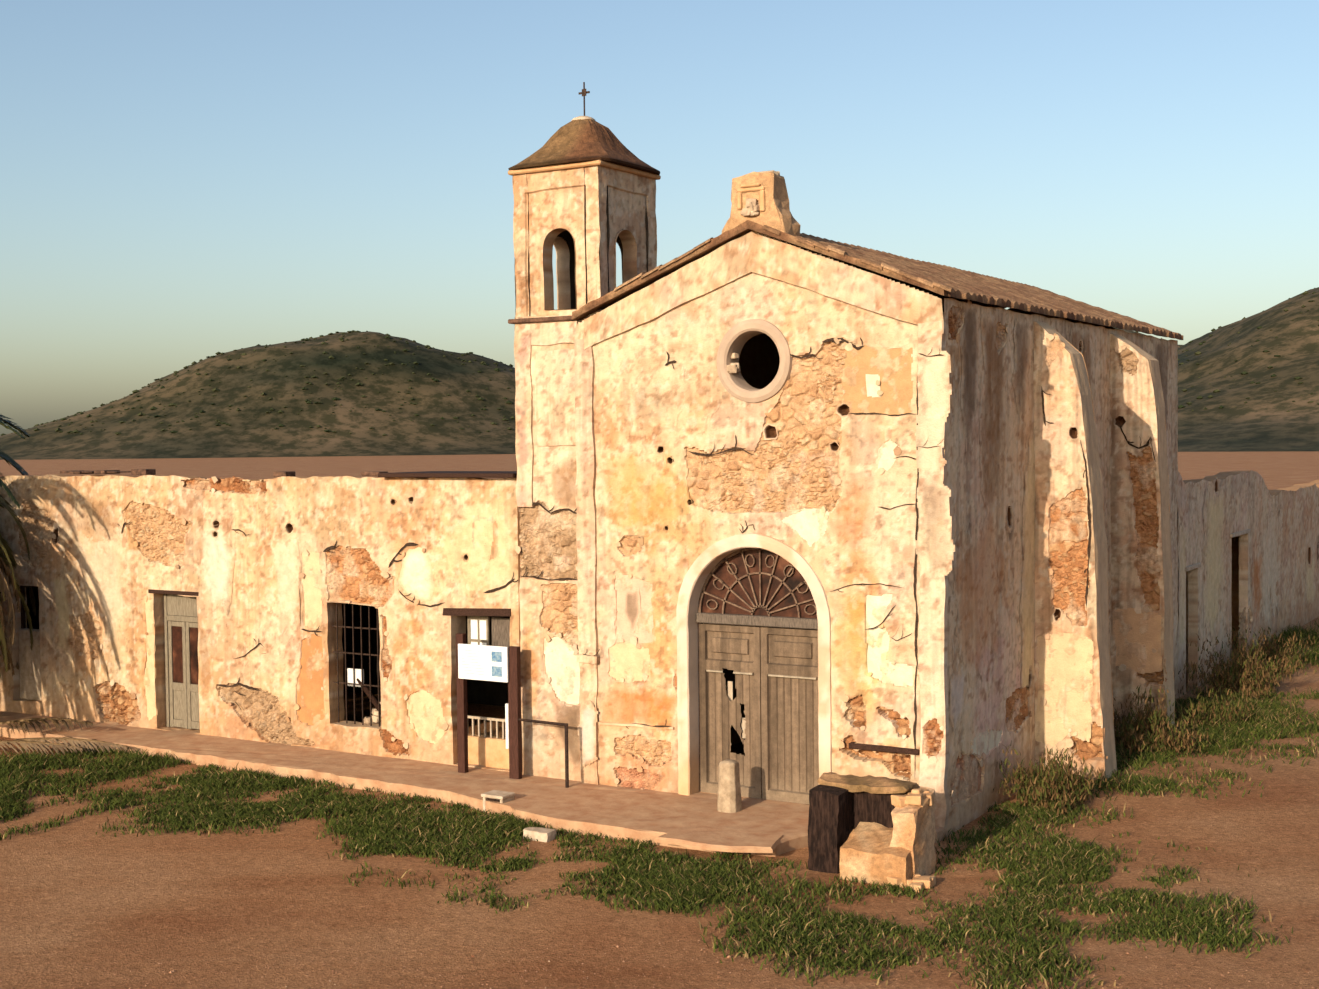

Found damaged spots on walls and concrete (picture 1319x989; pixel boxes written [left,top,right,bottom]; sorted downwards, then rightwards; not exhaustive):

flaking render [16,502,59,568]
flaking render [69,612,103,660]
flaking render [95,596,158,725]
flaking render [123,500,193,569]
flaking render [217,546,396,745]
flaking render [380,690,449,756]
flaking render [515,500,580,705]
flaking render [614,735,672,790]
flaking render [656,336,913,547]
crack [833,347,943,756]
flaking render [839,487,1108,805]
flaking render [1113,446,1167,687]